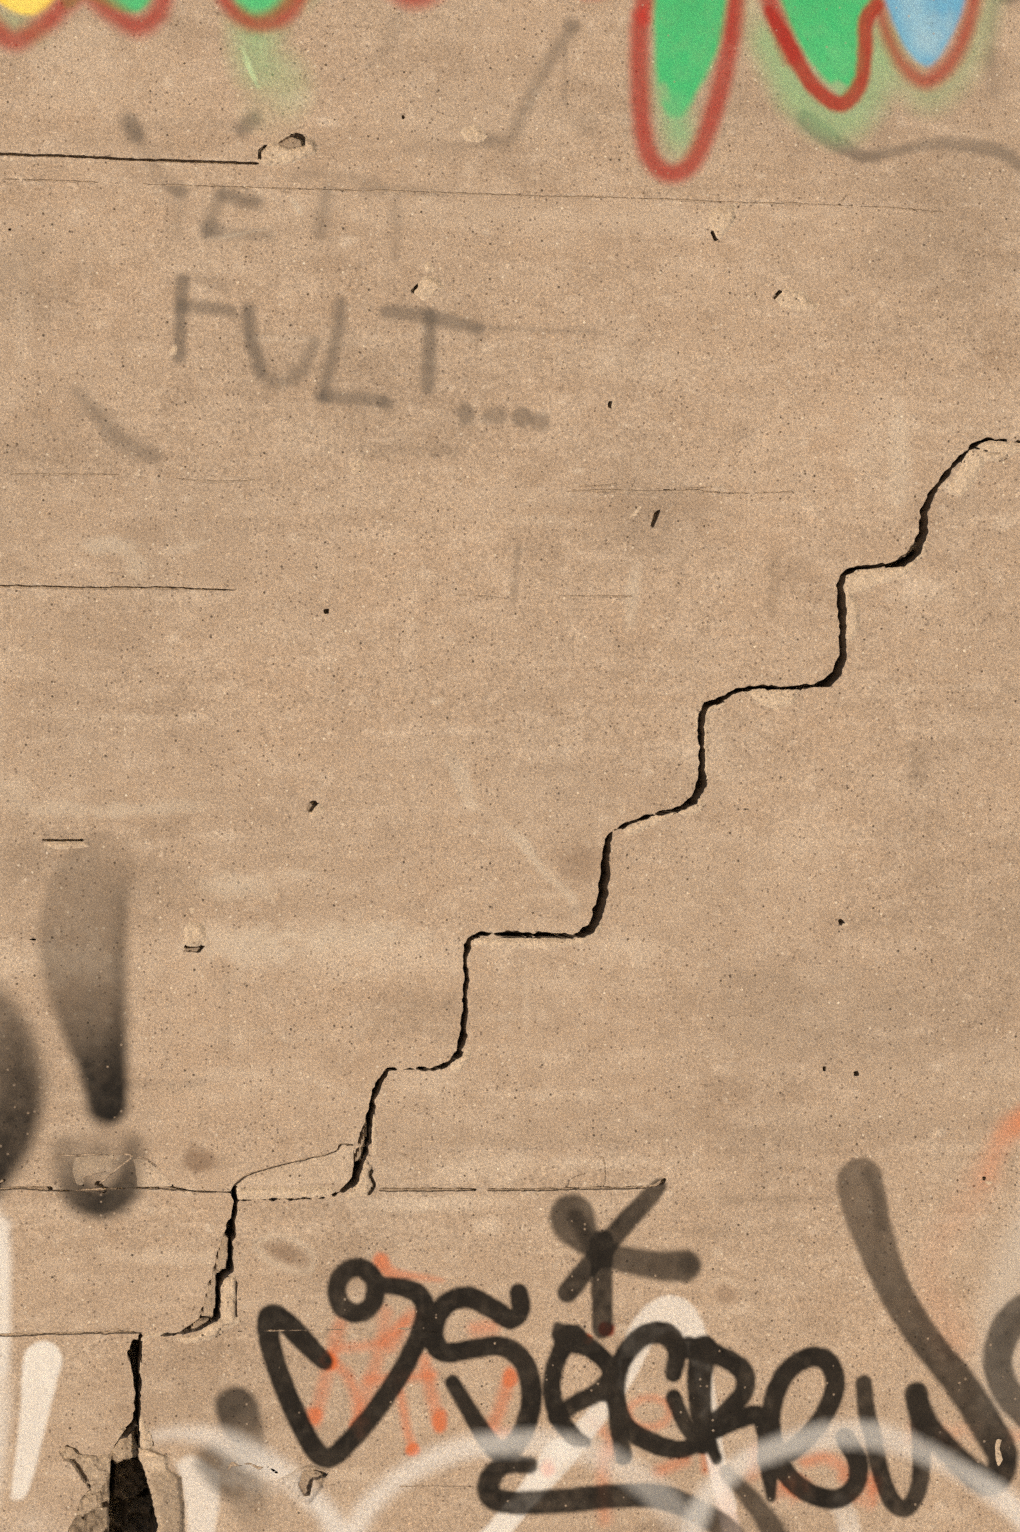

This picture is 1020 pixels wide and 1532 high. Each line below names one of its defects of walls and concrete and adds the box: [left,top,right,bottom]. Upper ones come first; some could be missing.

crack [0,152,943,213]
crack [0,437,1020,1450]
spalling [59,1426,185,1532]
crack [227,1462,263,1471]
crack [400,1481,474,1489]